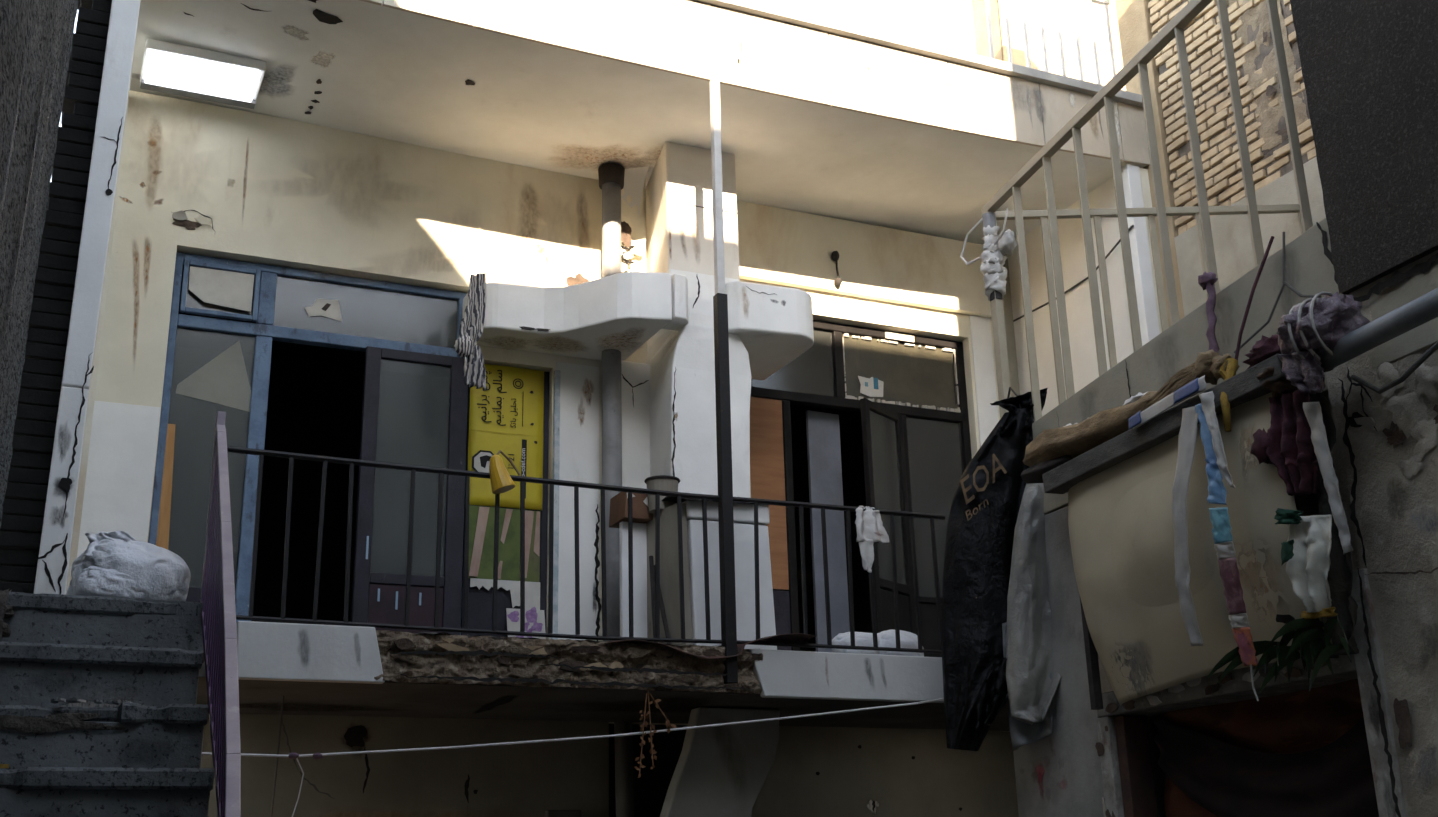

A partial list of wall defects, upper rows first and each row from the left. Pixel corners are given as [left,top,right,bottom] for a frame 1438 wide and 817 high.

peeling [305,53,332,114]
peeling [309,0,343,24]
leakage [580,0,922,91]
crack [103,117,123,196]
peeling [172,210,215,231]
rust [134,242,150,348]
peeling [1373,362,1438,478]
crack [36,357,94,594]
crack [1339,367,1438,817]
spalling [374,630,763,694]